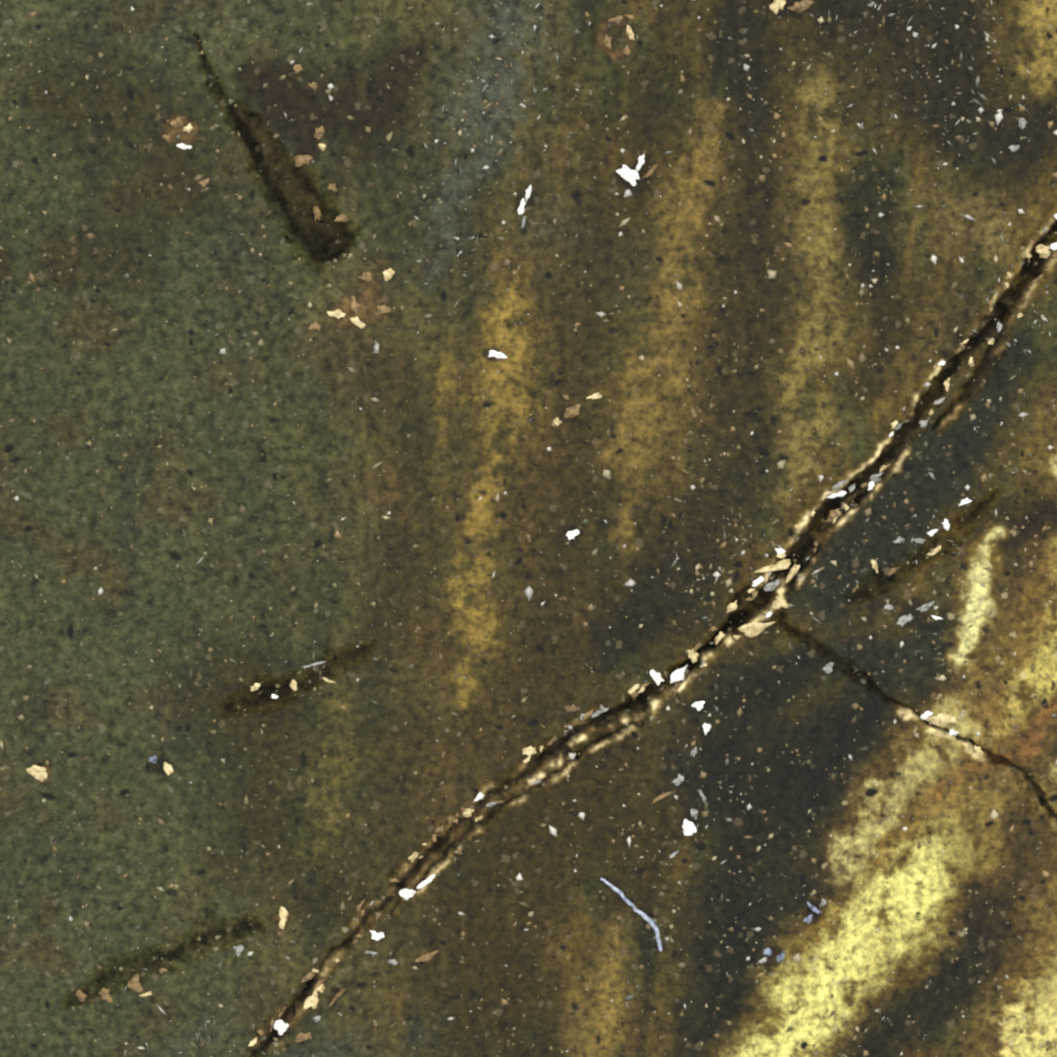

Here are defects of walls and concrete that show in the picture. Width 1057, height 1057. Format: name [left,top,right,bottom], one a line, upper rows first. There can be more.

damp [960,89,1057,202]
damp [845,149,929,415]
damp [340,344,416,469]
damp [1036,438,1057,507]
crack [238,206,1057,1057]
damp [158,506,1057,1057]
damp [103,972,260,1057]